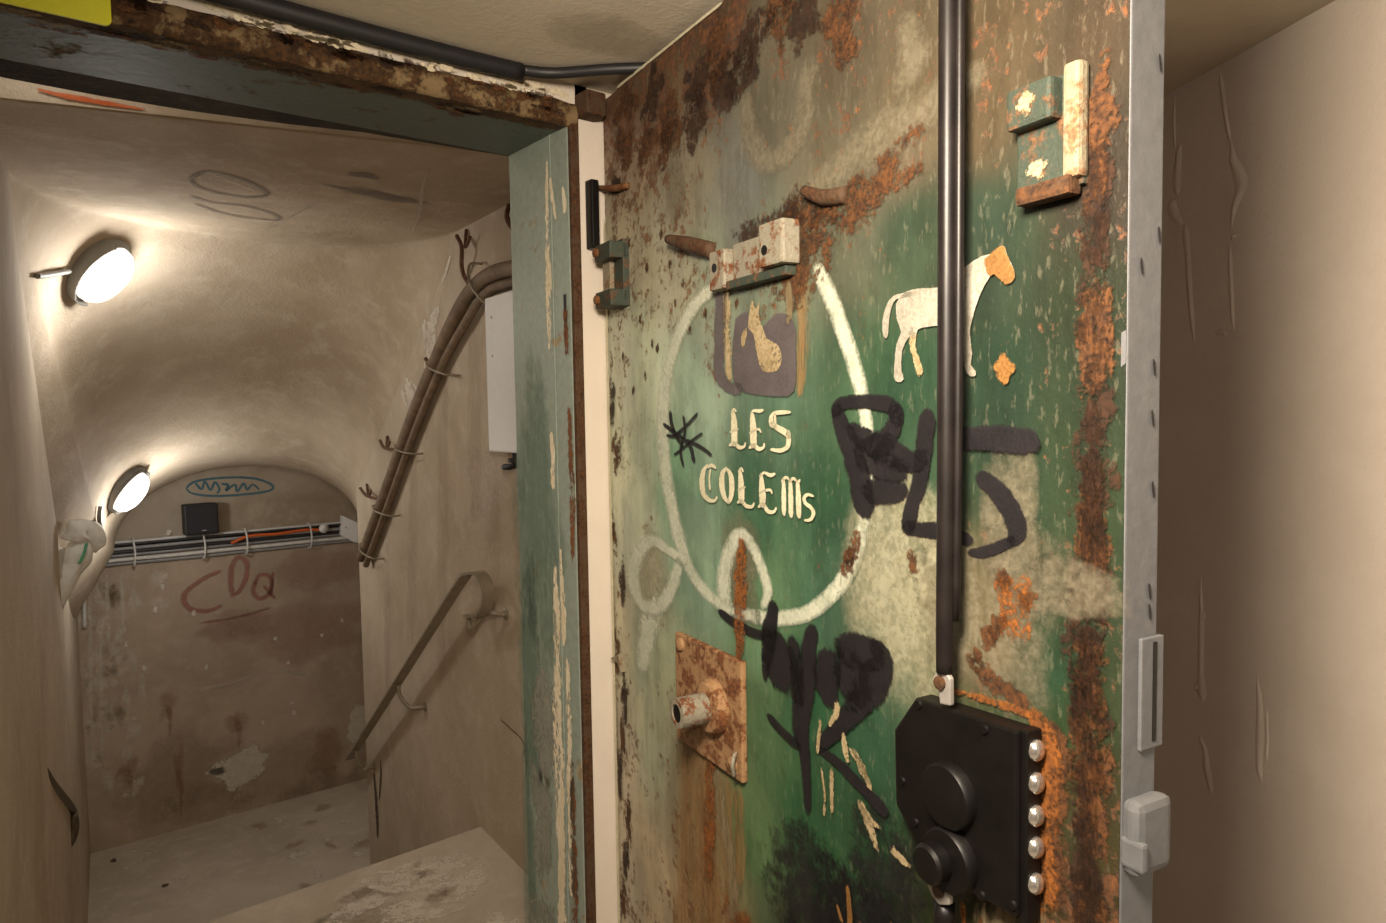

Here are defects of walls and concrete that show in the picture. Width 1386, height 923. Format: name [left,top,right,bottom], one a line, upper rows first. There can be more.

rust [0,0,562,130]
rust [610,0,860,196]
rust [736,122,924,312]
rust [954,48,1121,923]
rust [733,538,748,660]
rust [840,530,861,577]
rust [906,549,918,574]
flaking render [205,742,269,792]
rust [703,759,751,923]